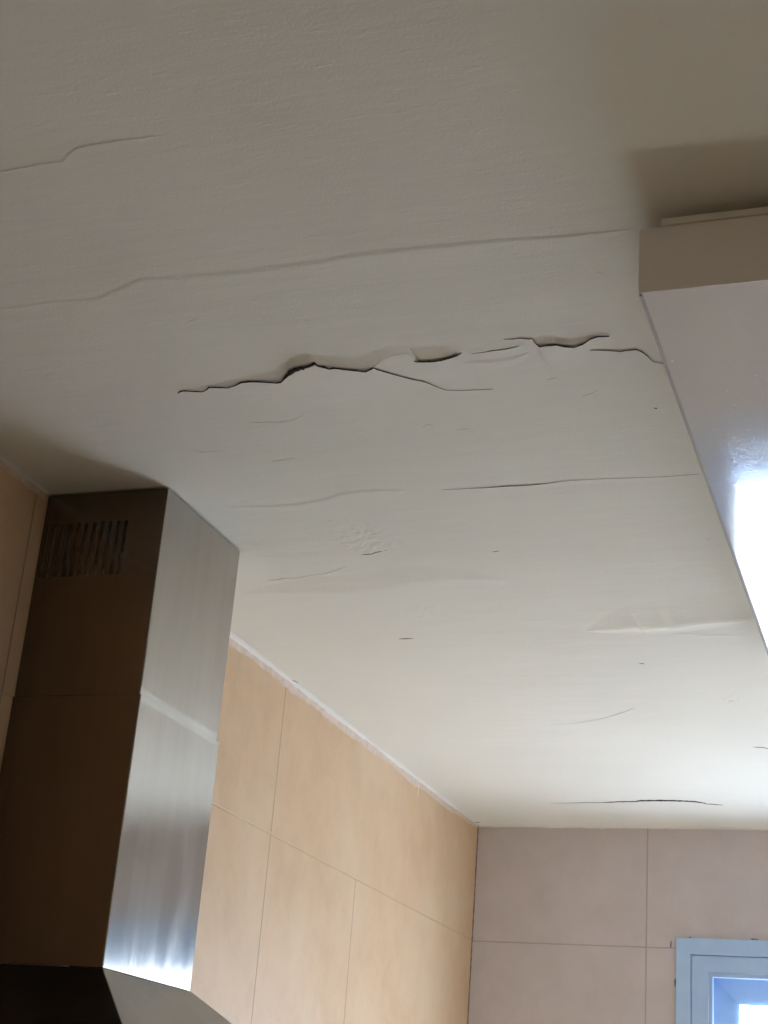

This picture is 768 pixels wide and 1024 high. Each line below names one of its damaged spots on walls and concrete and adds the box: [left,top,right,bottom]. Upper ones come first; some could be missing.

crack [0,135,170,174]
crack [442,474,698,490]
crack [583,798,719,806]